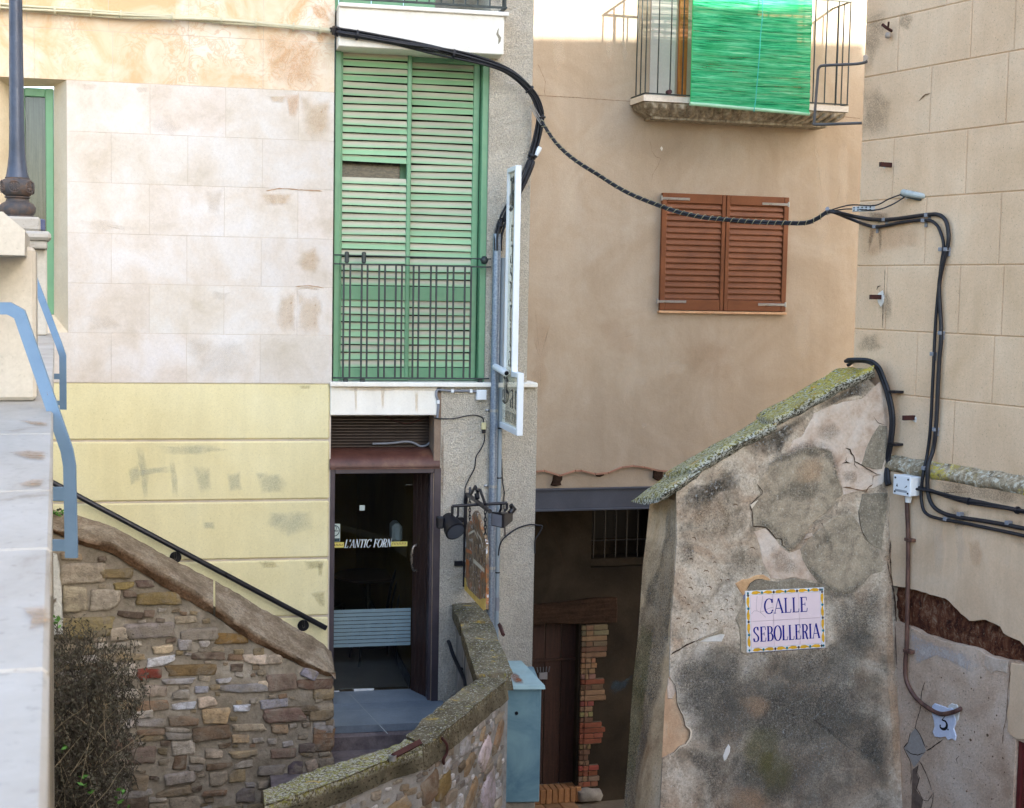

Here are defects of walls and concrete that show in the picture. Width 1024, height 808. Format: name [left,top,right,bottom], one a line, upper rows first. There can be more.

crack [267,186,321,194]
flaking render [707,575,770,595]
flaking render [667,678,692,754]
flaking render [904,729,926,808]